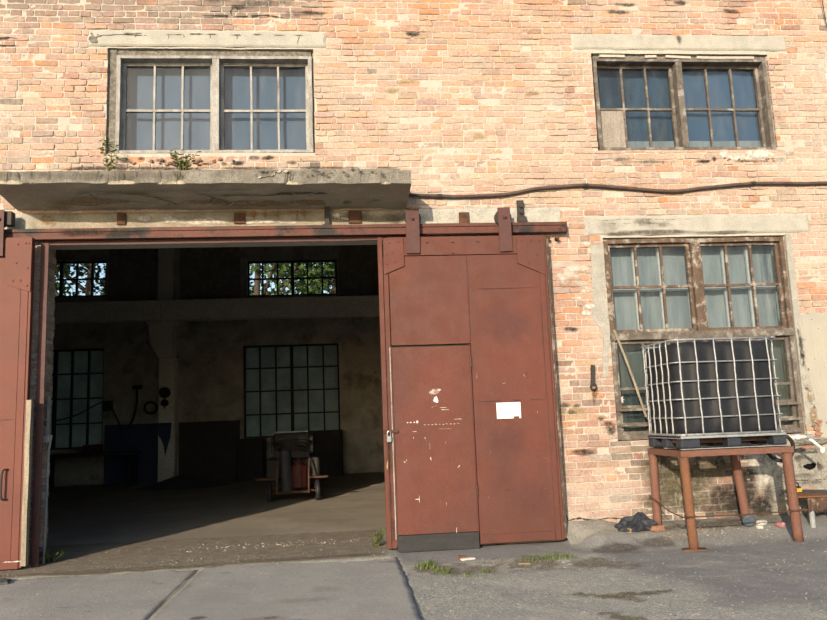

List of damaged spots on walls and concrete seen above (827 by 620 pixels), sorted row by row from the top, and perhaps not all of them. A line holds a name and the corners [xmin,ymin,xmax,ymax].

spalling [794,329,827,470]